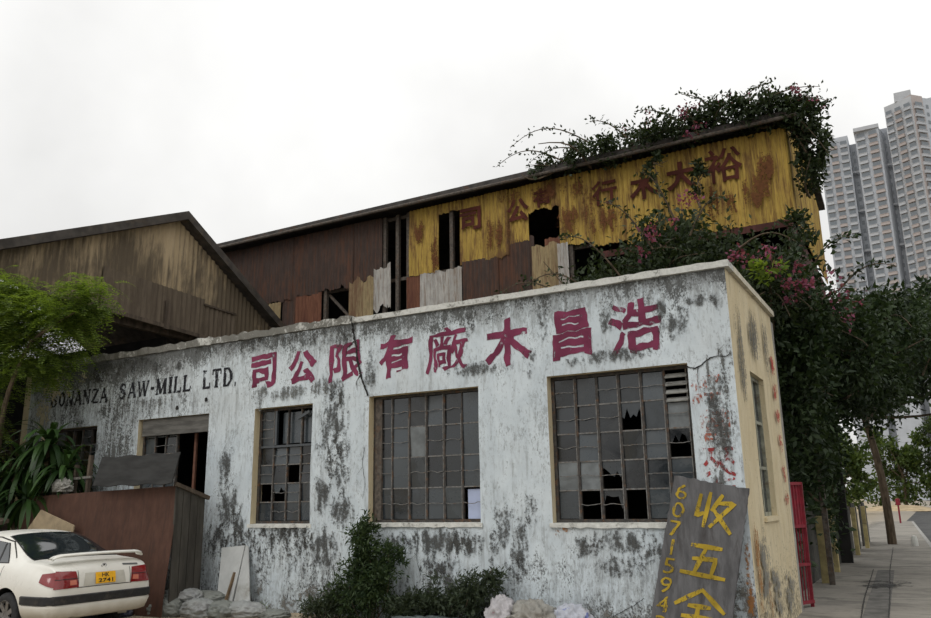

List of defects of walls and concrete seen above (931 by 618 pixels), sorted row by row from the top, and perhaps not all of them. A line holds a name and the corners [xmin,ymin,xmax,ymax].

rust [706,151,774,219]
rust [410,221,439,273]
leakage [599,304,616,333]
leakage [653,294,719,340]
crack [345,317,368,396]
crack [687,352,730,388]
leakage [240,381,354,613]
leakage [384,494,538,594]
leakage [575,529,662,578]